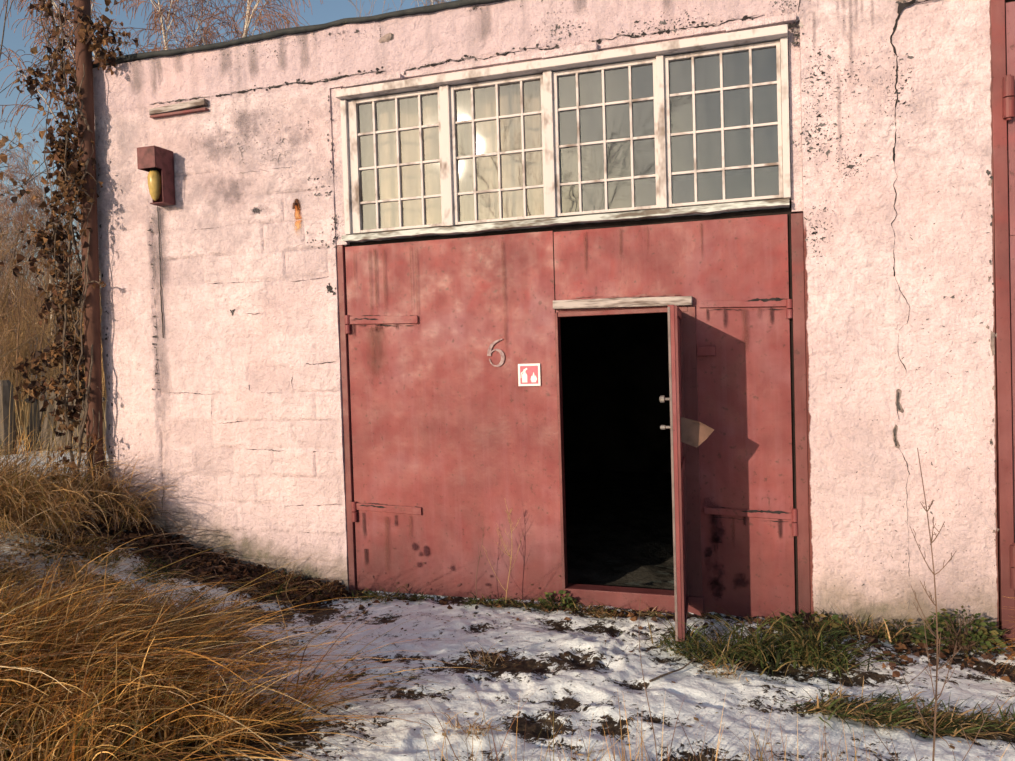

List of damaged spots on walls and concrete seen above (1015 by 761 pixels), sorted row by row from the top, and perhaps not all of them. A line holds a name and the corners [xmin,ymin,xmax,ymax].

crack [592,15,763,44]
crack [149,44,559,105]
rust [292,199,302,231]
crack [884,0,929,384]
crack [900,450,910,577]